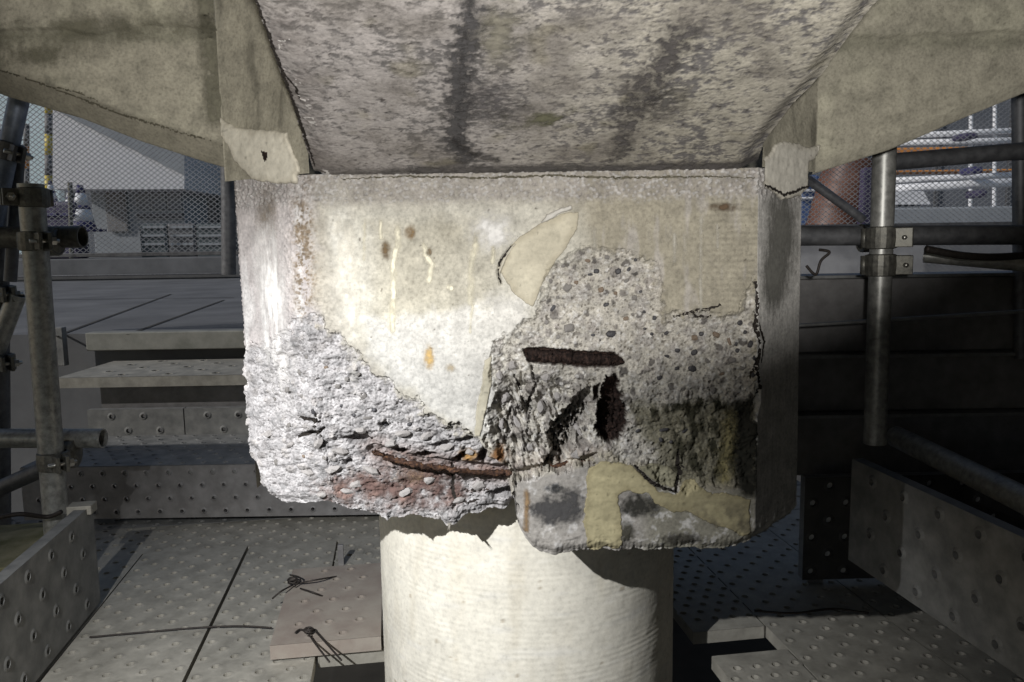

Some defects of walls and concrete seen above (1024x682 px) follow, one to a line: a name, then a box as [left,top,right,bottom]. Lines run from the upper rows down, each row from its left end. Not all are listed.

leakage [384,0,759,174]
spalling [242,205,761,530]
crack [749,281,766,403]
rust [333,462,463,506]
rust [491,446,504,462]